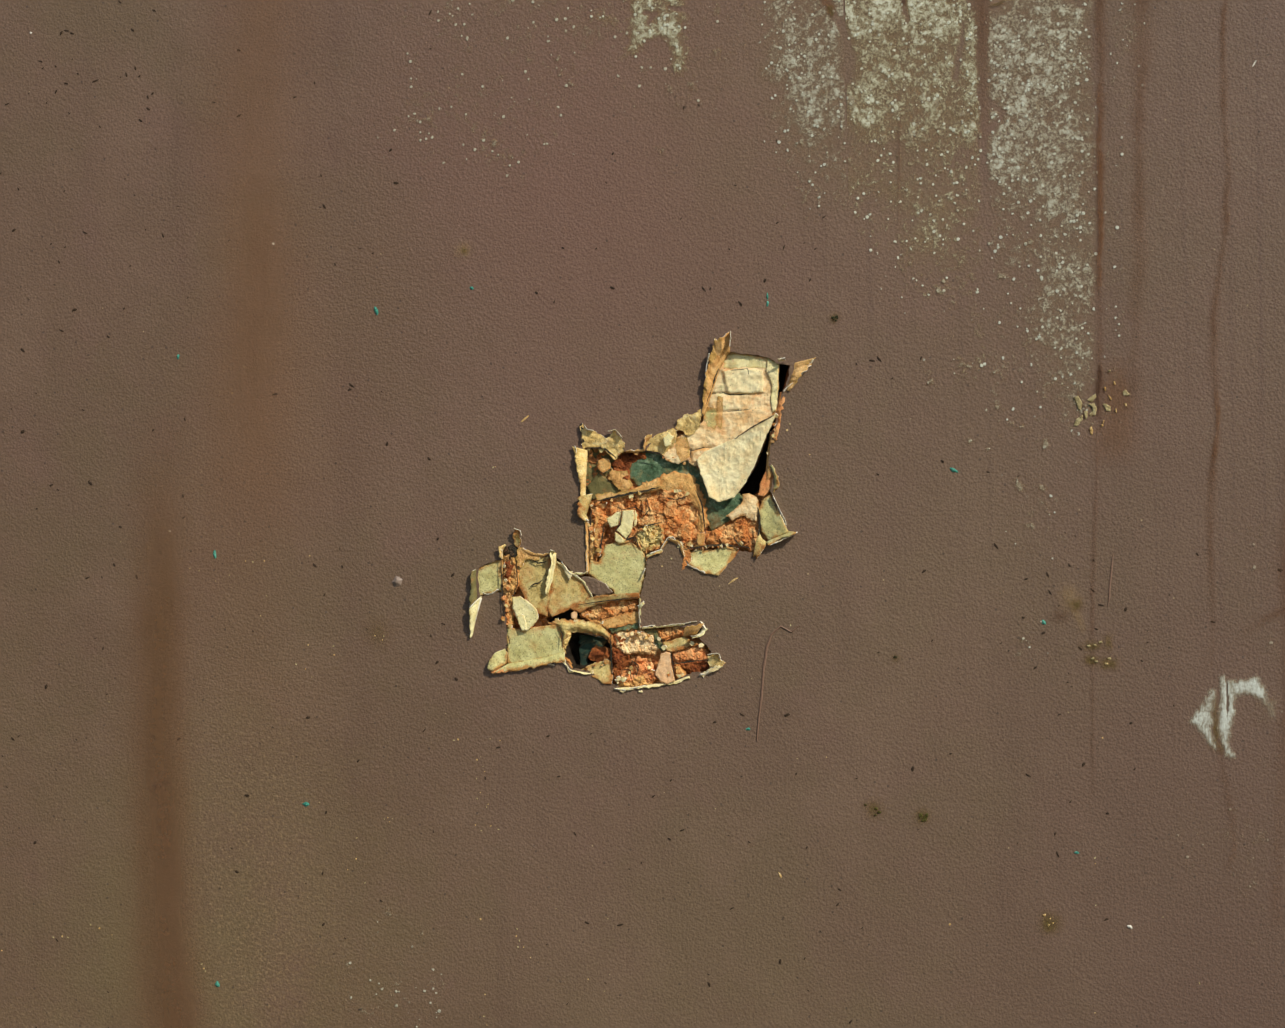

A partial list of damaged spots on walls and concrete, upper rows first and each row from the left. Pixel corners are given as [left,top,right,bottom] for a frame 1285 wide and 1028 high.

water stain [393,52,569,177]
water stain [502,0,702,104]
water stain [743,0,1145,435]
peeling [469,331,815,693]